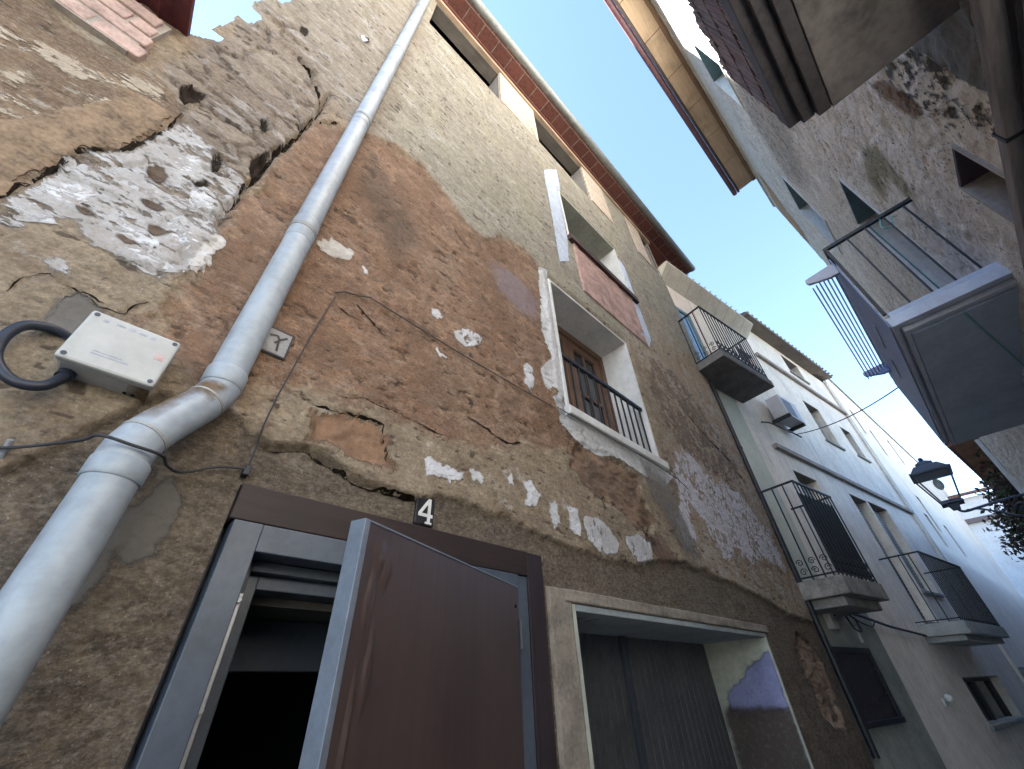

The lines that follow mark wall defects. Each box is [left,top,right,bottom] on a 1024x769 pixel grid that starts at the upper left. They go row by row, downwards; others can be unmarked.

crack [0,113,182,199]
crack [218,65,337,227]
peeling [0,123,247,278]
peeling [317,237,354,261]
spalling [304,407,396,472]
crack [267,393,442,502]
peeling [424,456,484,484]
crack [467,416,521,445]
peeling [507,259,787,573]